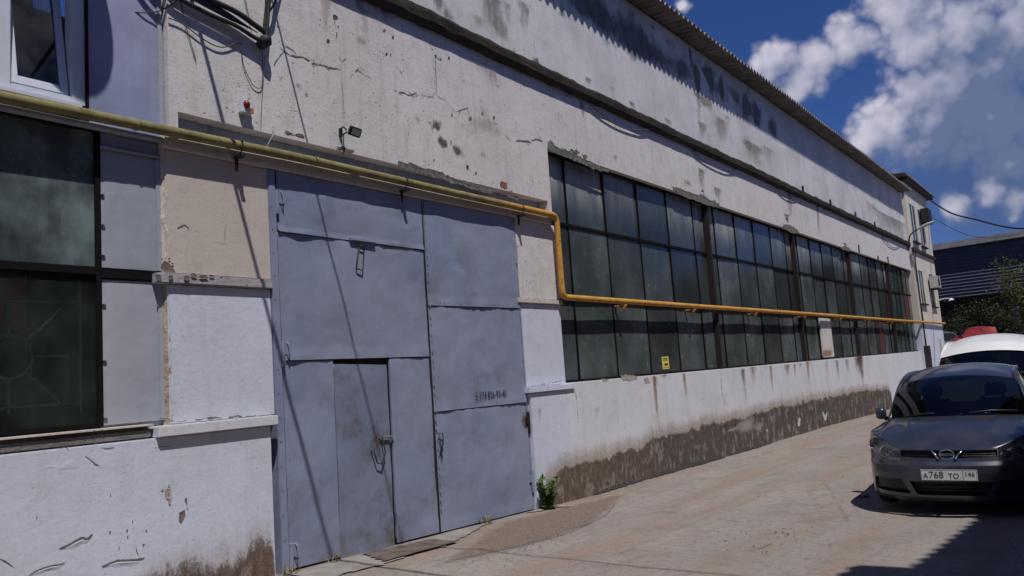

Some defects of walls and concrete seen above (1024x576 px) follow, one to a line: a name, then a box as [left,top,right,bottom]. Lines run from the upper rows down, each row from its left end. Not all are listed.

crack [395,54,469,113]
water stain [561,0,777,136]
peeling [156,258,215,281]
water stain [546,387,892,505]
peeling [162,485,188,522]
water stain [155,537,275,576]